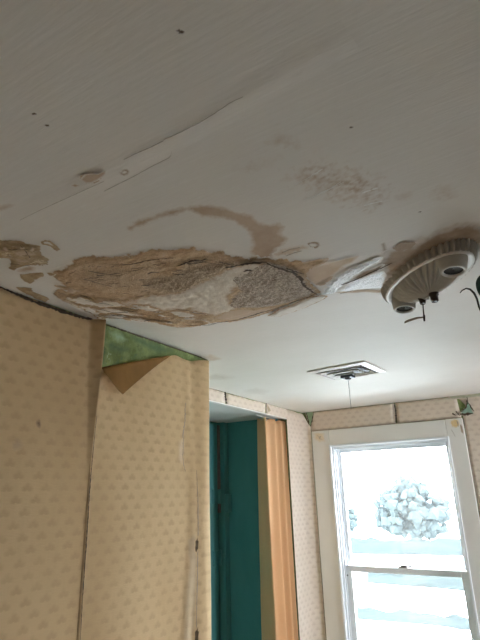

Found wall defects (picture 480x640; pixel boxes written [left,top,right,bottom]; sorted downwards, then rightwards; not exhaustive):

crack [21,97,242,220]
peeling [0,238,391,367]
damp [123,203,291,259]
damp [375,219,480,279]